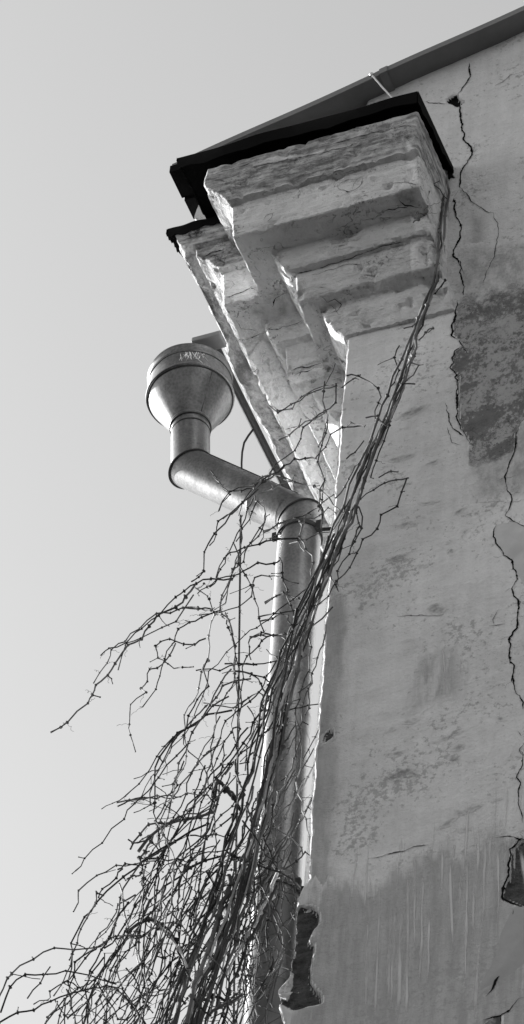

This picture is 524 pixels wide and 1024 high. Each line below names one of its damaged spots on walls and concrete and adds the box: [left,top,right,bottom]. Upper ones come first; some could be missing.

crack [323,125,416,153]
crack [384,182,422,212]
crack [206,245,301,341]
crack [300,241,402,315]
crack [428,64,499,445]
peeling [452,283,524,466]
crack [491,425,524,707]
damp [283,584,524,1024]
spalling [504,843,524,906]
spalling [281,908,321,1010]